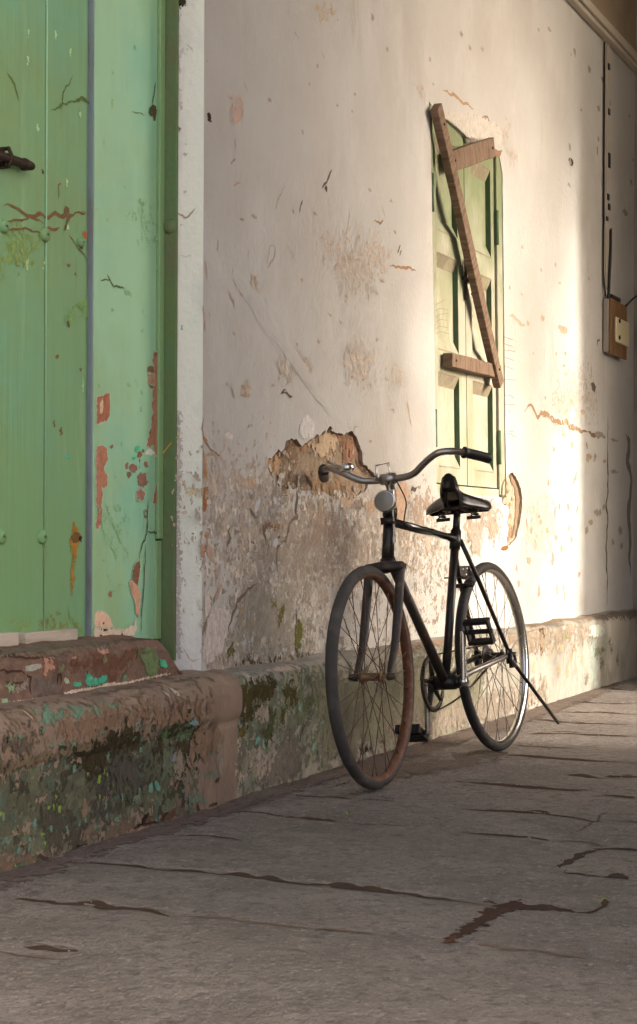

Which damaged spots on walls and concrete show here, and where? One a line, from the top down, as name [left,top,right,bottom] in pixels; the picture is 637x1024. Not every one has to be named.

spalling [268,426,376,513]
spalling [499,473,522,551]
crack [525,403,609,590]
leakage [0,643,215,768]